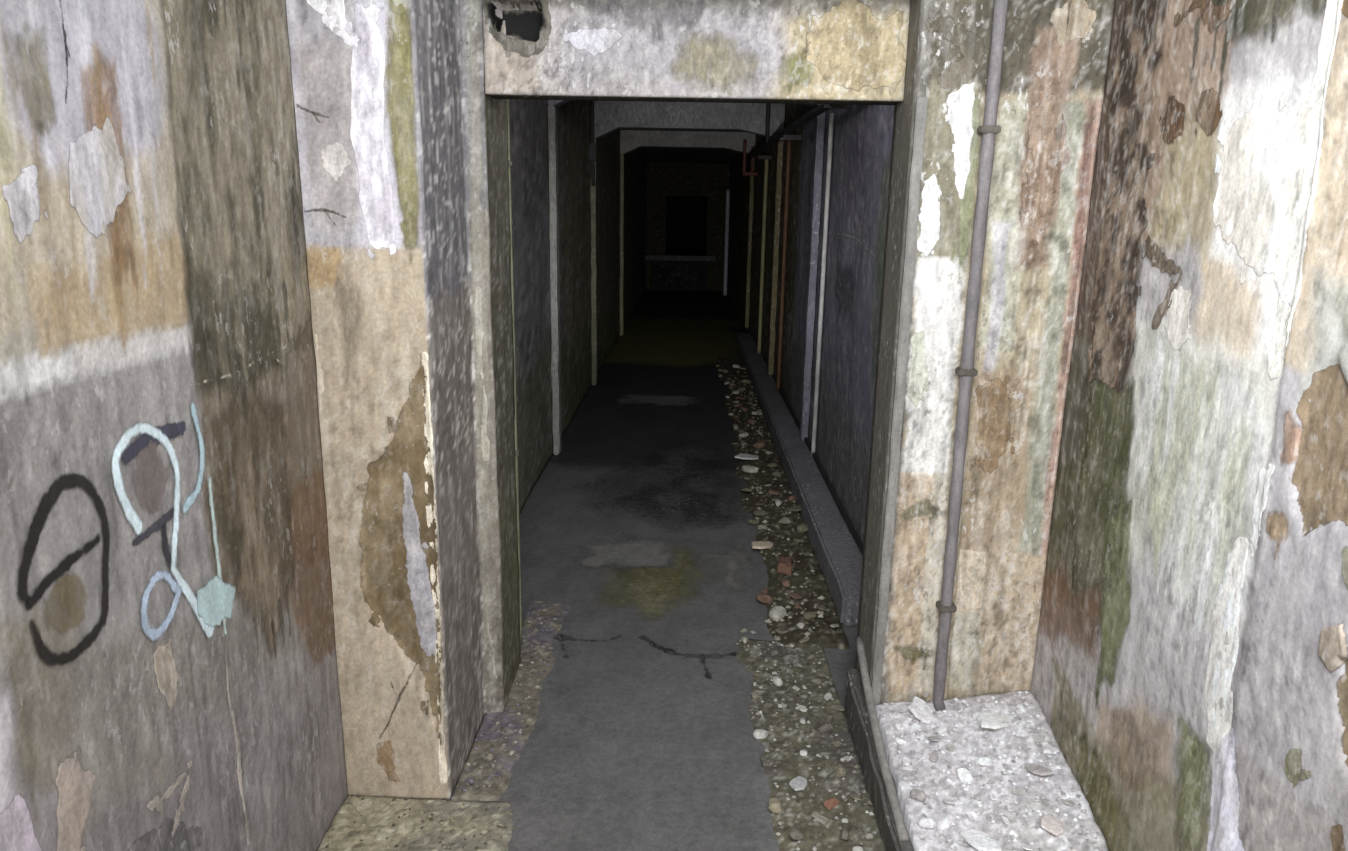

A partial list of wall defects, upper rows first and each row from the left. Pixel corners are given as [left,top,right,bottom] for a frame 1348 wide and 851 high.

spalling [483,0,635,57]
flaking render [1050,0,1097,47]
flaking render [1088,0,1348,393]
flaking render [356,352,448,784]
crack [553,634,736,679]
damp [1071,337,1255,703]
peeling [1204,461,1275,753]
flaking render [1291,364,1348,536]
peeling [1318,621,1348,766]
flaking render [1284,748,1311,788]
flaking render [1330,824,1345,851]